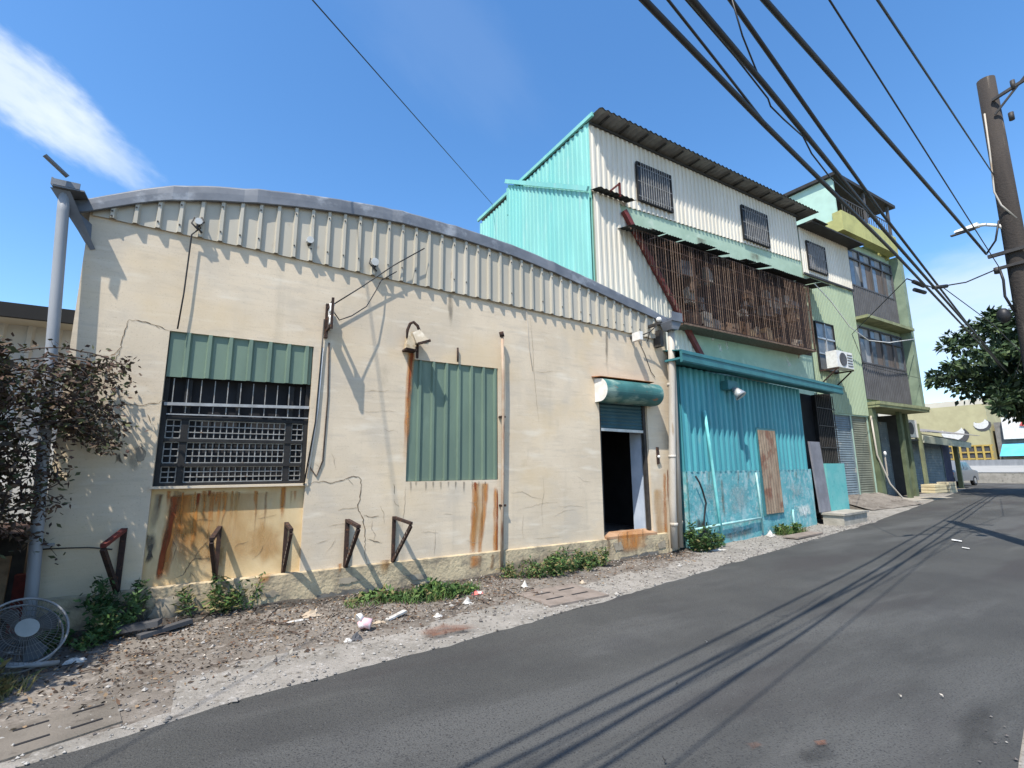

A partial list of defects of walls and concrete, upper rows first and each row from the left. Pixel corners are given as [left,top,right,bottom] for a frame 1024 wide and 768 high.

crack [111,319,166,360]
corrosion [157,491,233,578]
crack [311,455,476,562]
corrosion [471,482,498,566]
corrosion [618,531,639,548]